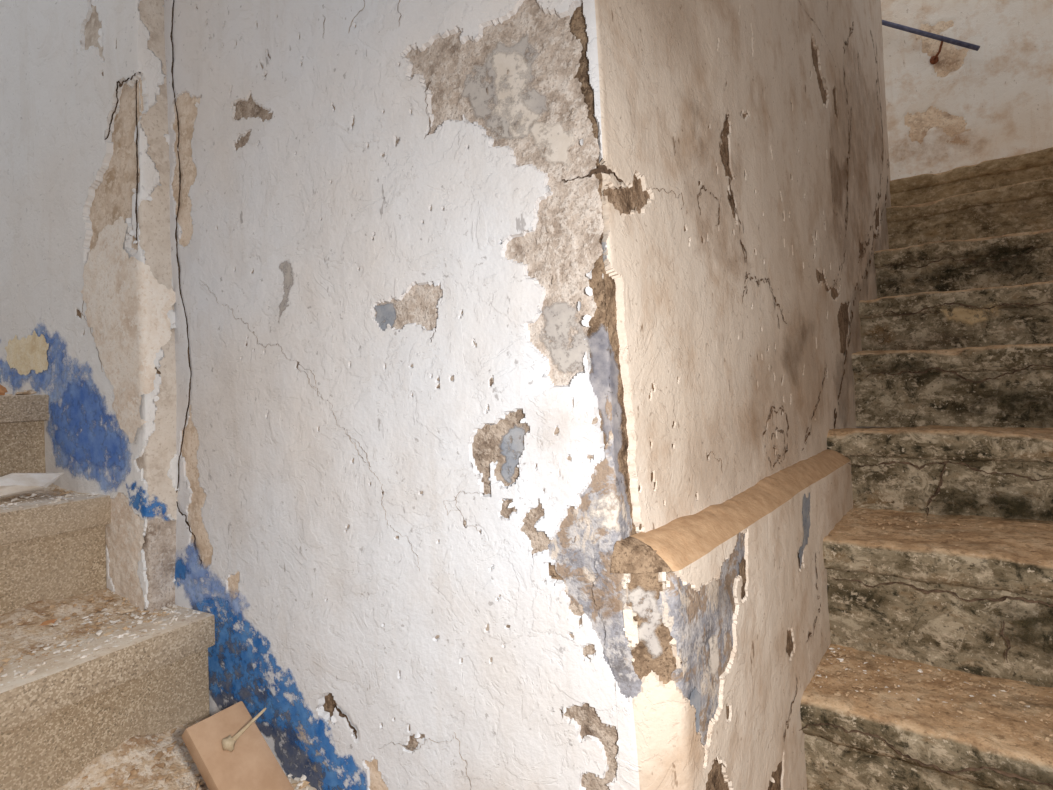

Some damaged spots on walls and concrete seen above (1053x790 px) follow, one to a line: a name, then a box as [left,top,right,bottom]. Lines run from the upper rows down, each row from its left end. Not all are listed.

peeling [811,39,838,119]
flaking render [89,0,201,290]
peeling [231,90,273,151]
crack [562,165,625,185]
crack [719,114,787,327]
spalling [374,281,443,341]
spalling [399,0,748,746]
spalling [106,324,213,613]
peeling [392,725,471,785]
peeling [559,703,621,790]
peeling [706,756,729,790]
peeling [768,761,782,790]